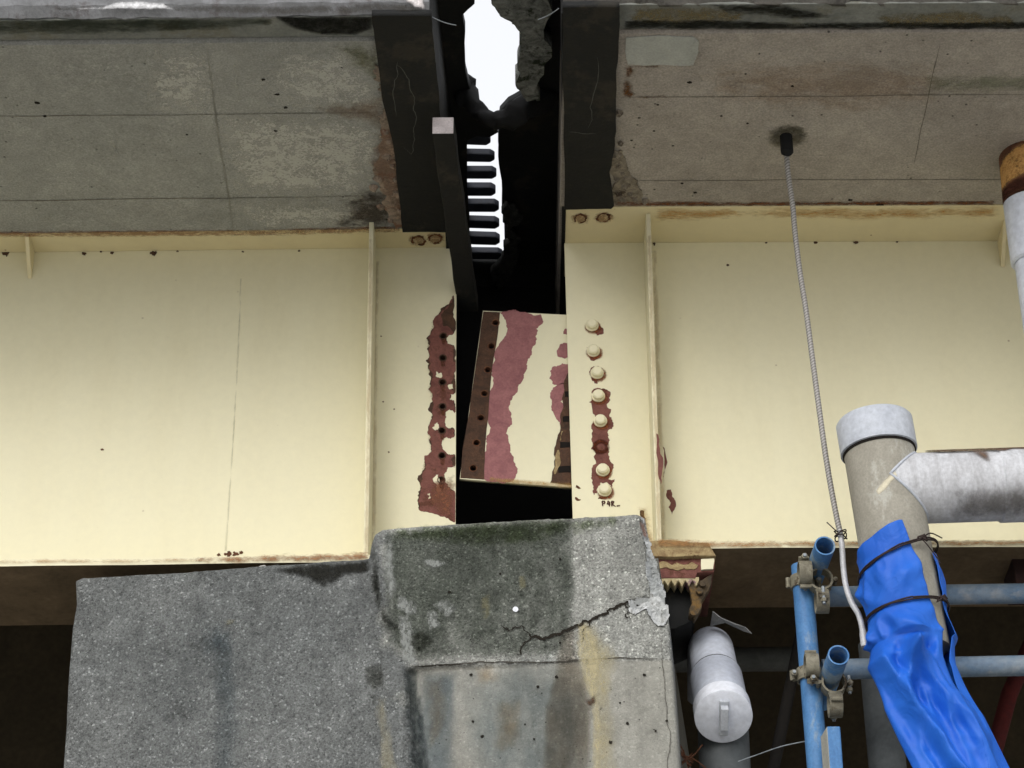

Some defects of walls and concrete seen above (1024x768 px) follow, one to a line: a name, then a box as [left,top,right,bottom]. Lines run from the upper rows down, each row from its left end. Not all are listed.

spalling [491,0,553,102]
water stain [221,51,388,229]
rust [573,144,1024,223]
peeling [549,329,568,422]
rust [492,373,572,487]
rust [592,419,609,454]
spalling [628,517,670,626]
crack [501,599,639,655]